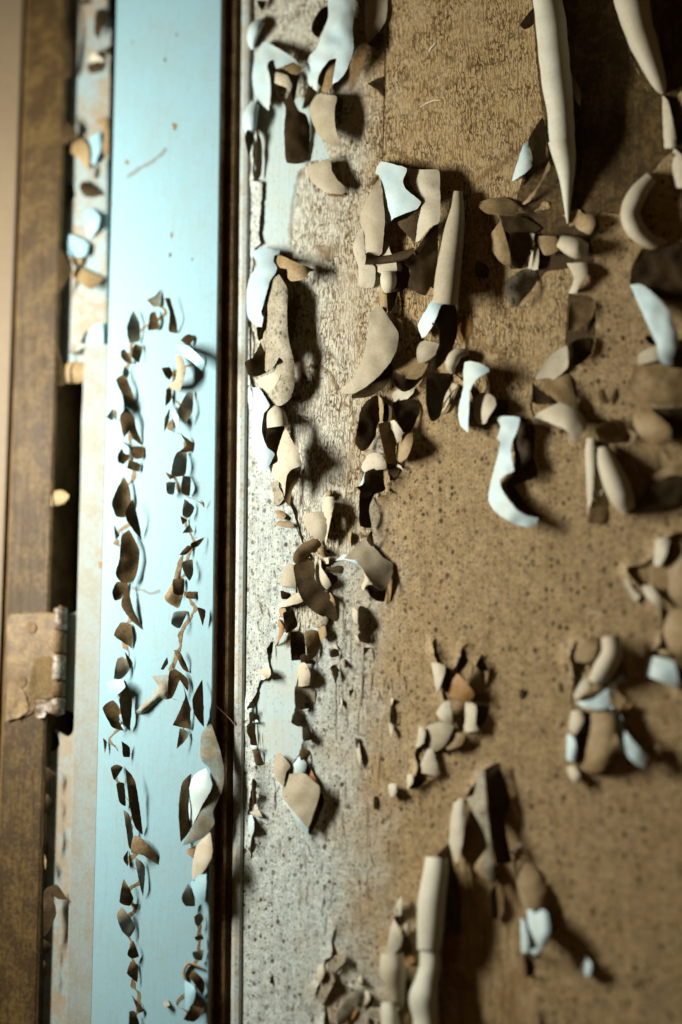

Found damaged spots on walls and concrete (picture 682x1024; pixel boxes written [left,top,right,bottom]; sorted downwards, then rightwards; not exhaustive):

peeling [56,0,112,386]
peeling [51,490,69,507]
peeling [243,0,682,834]
peeling [103,289,224,1024]
peeling [44,767,56,869]
peeling [43,884,68,977]
peeling [248,779,262,859]
peeling [316,763,550,1024]